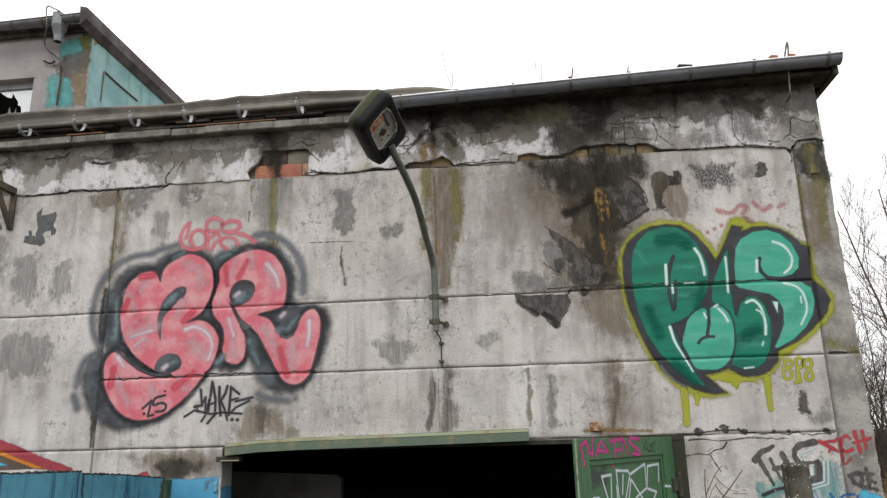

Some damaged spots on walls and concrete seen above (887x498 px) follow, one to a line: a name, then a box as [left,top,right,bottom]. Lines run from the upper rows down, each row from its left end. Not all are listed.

crack [610,106,824,162]
spalling [248,150,310,179]
spalling [406,157,463,169]
spalling [517,144,662,162]
rust [594,187,610,219]